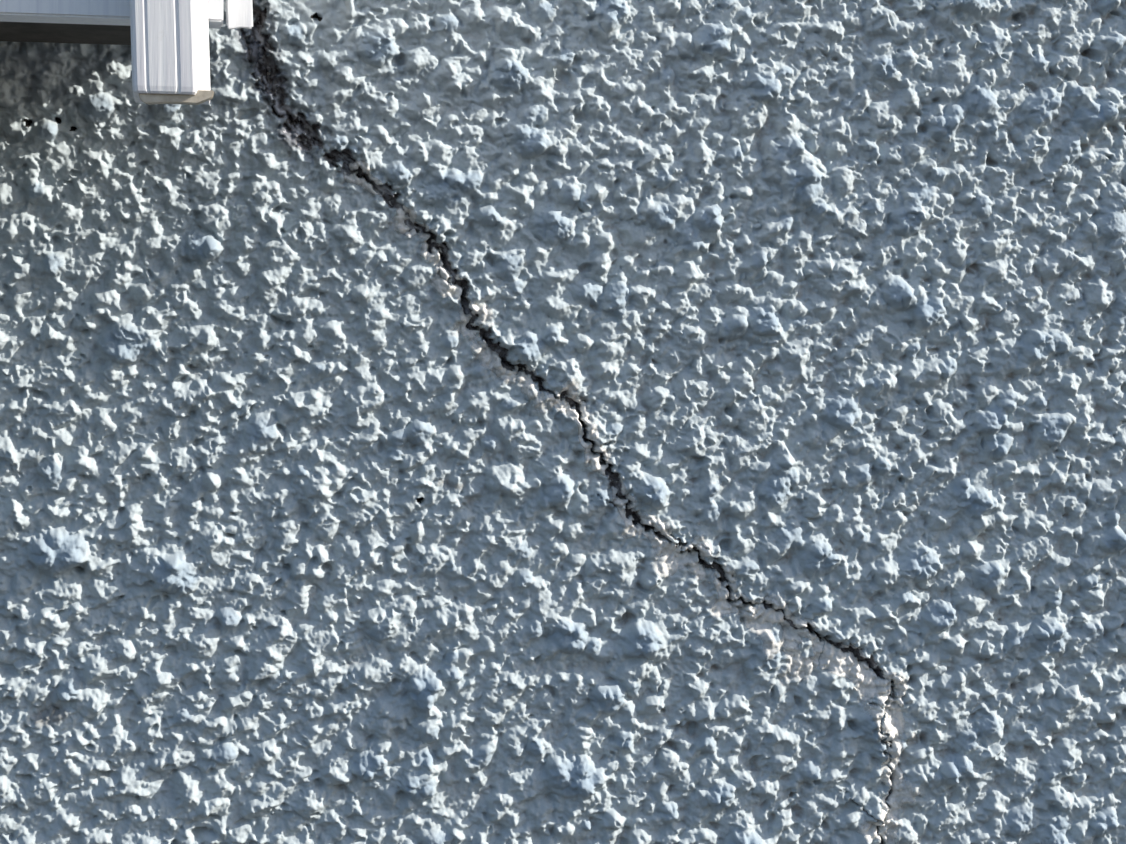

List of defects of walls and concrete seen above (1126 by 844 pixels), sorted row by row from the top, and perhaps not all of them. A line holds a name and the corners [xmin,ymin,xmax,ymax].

crack [240,0,894,844]